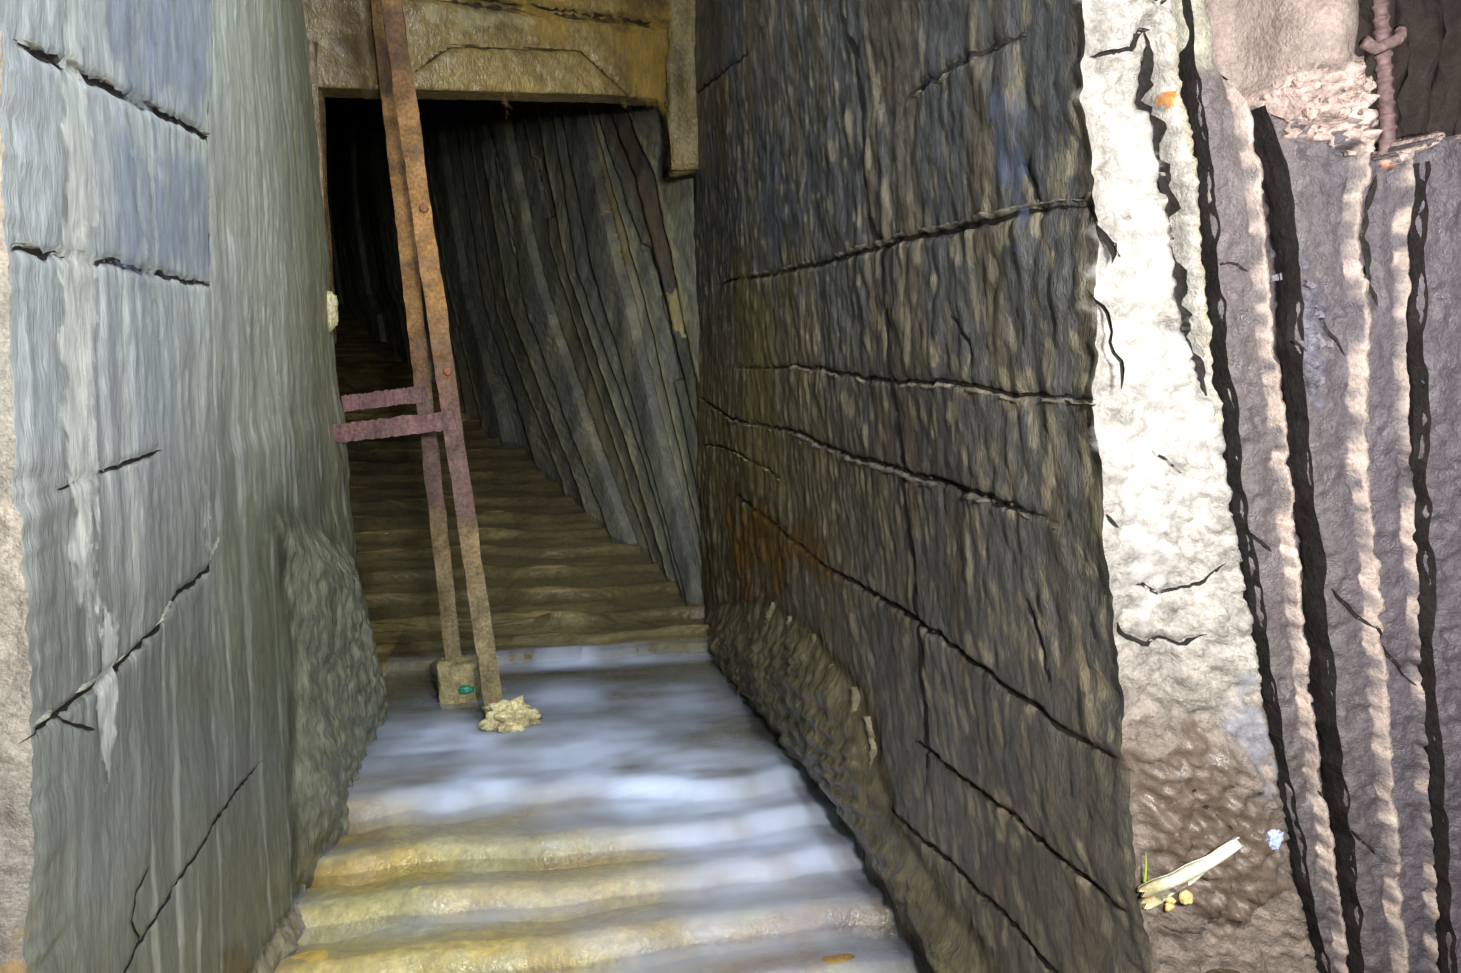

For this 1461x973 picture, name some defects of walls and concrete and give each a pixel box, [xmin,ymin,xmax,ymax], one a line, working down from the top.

spalling [1243,56,1461,164]
crack [697,0,1135,918]
crack [1090,0,1458,973]
crack [123,760,263,973]
crack [890,806,1058,973]